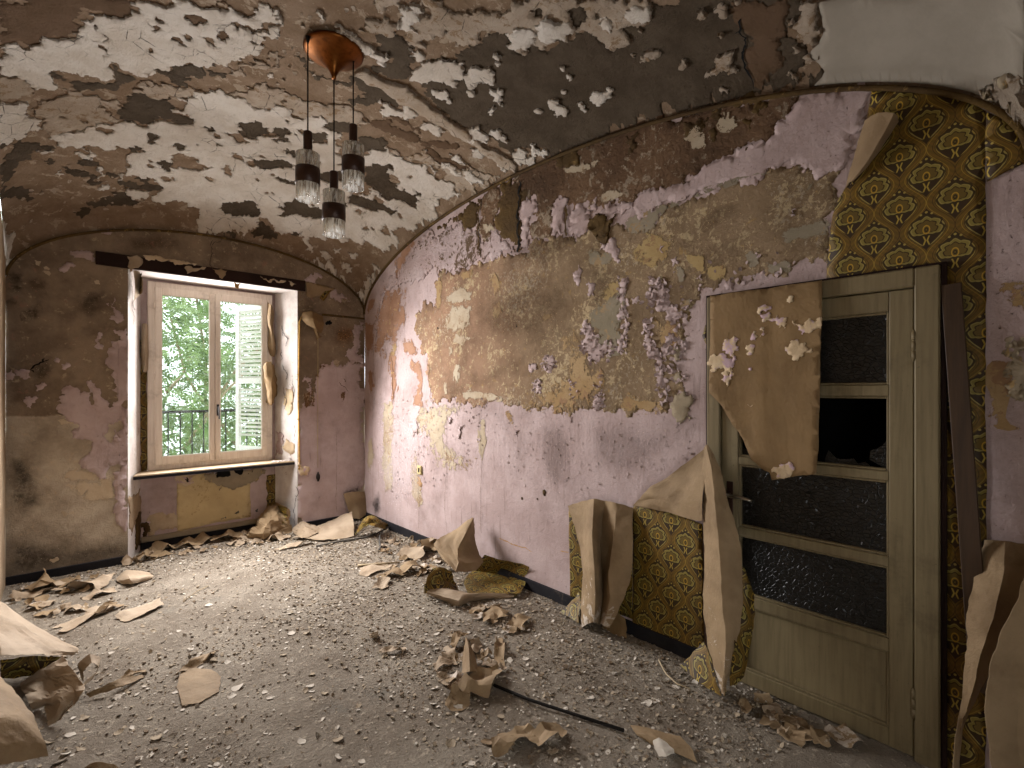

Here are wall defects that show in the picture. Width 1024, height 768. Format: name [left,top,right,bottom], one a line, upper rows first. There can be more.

spalling [0,0,1024,550]